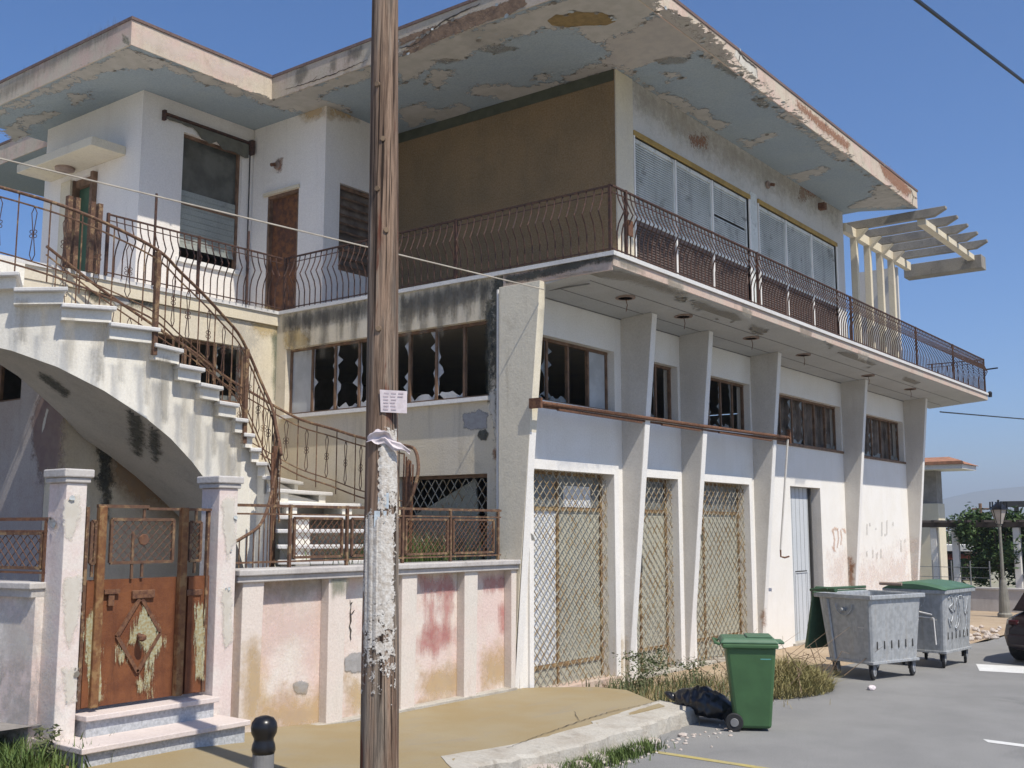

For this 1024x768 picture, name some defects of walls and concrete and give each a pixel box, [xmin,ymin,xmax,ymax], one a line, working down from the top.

peeling [0,35,371,143]
peeling [398,0,914,209]
water stain [94,448,177,519]
water stain [127,411,161,462]